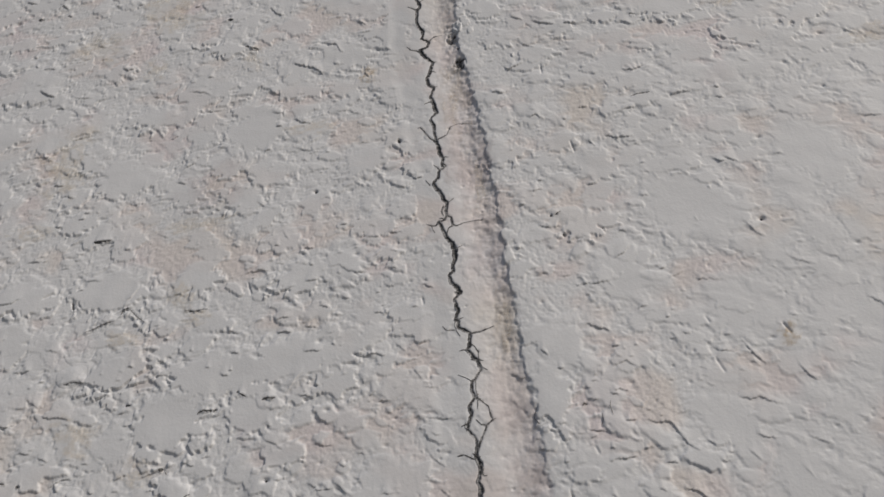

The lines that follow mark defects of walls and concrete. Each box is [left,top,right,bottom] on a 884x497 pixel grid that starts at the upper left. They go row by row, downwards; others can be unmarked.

crack [407,0,496,497]